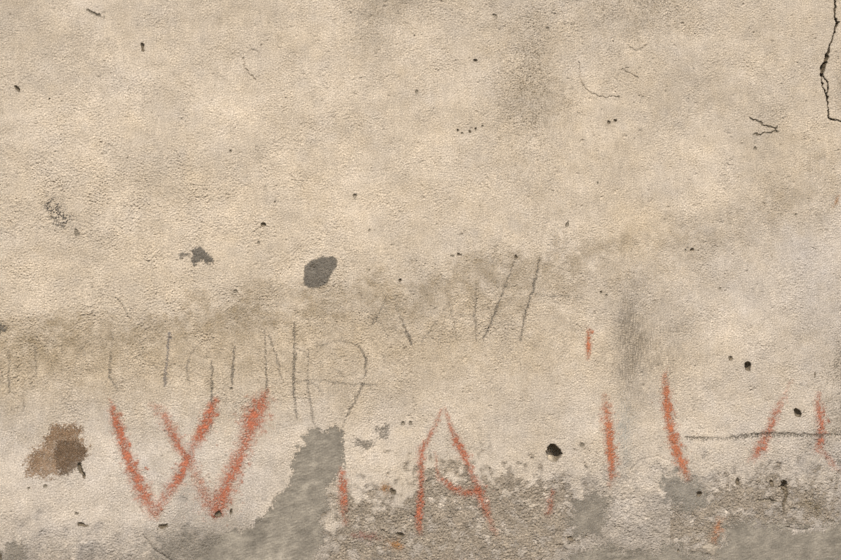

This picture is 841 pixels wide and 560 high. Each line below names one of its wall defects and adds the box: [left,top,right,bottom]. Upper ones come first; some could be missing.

crack [820,0,841,122]
crack [750,118,779,136]
damp [180,246,213,266]
damp [304,256,337,287]
crack [731,432,835,440]
spalling [152,425,841,560]